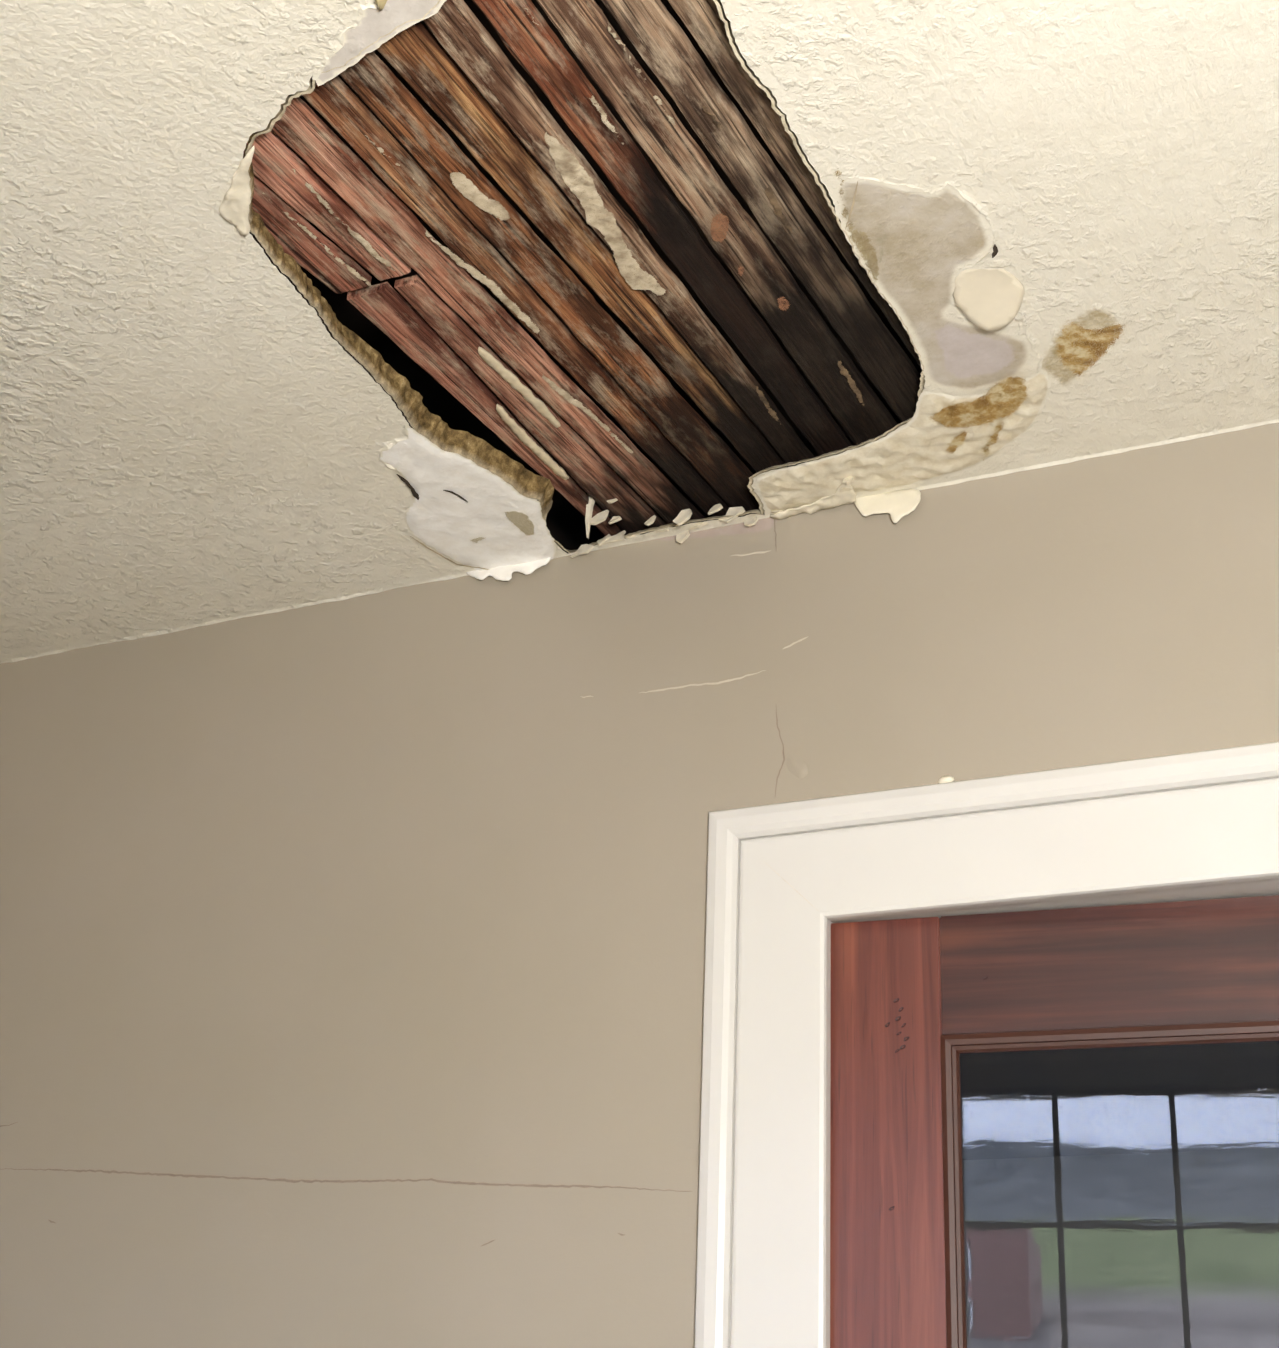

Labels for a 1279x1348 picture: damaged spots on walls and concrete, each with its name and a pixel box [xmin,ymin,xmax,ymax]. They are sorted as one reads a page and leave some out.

spalling [219,0,921,581]
peeling [713,0,1044,397]
crack [5,1168,692,1192]